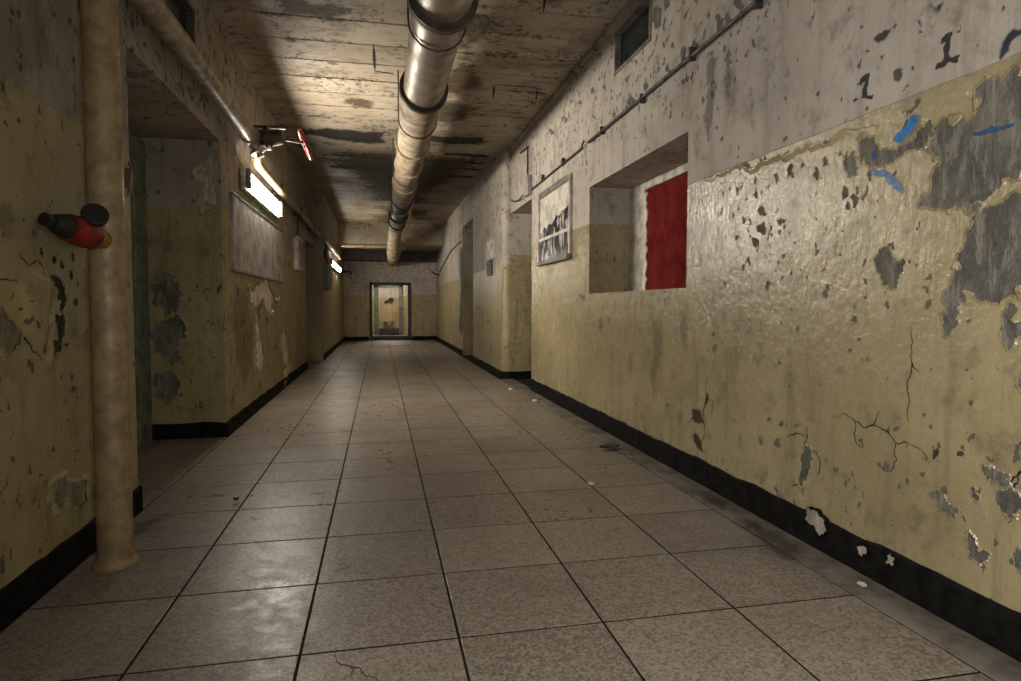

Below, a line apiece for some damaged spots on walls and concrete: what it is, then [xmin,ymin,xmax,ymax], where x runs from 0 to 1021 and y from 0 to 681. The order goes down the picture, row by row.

peeling [703,62,1021,394]
peeling [237,278,290,391]
crack [837,328,927,472]
spalling [796,444,828,491]
spalling [804,506,830,536]
peeling [928,488,963,520]
peeling [969,462,1021,522]
peeling [965,528,992,568]
peeling [1010,544,1021,574]
crack [333,653,379,681]